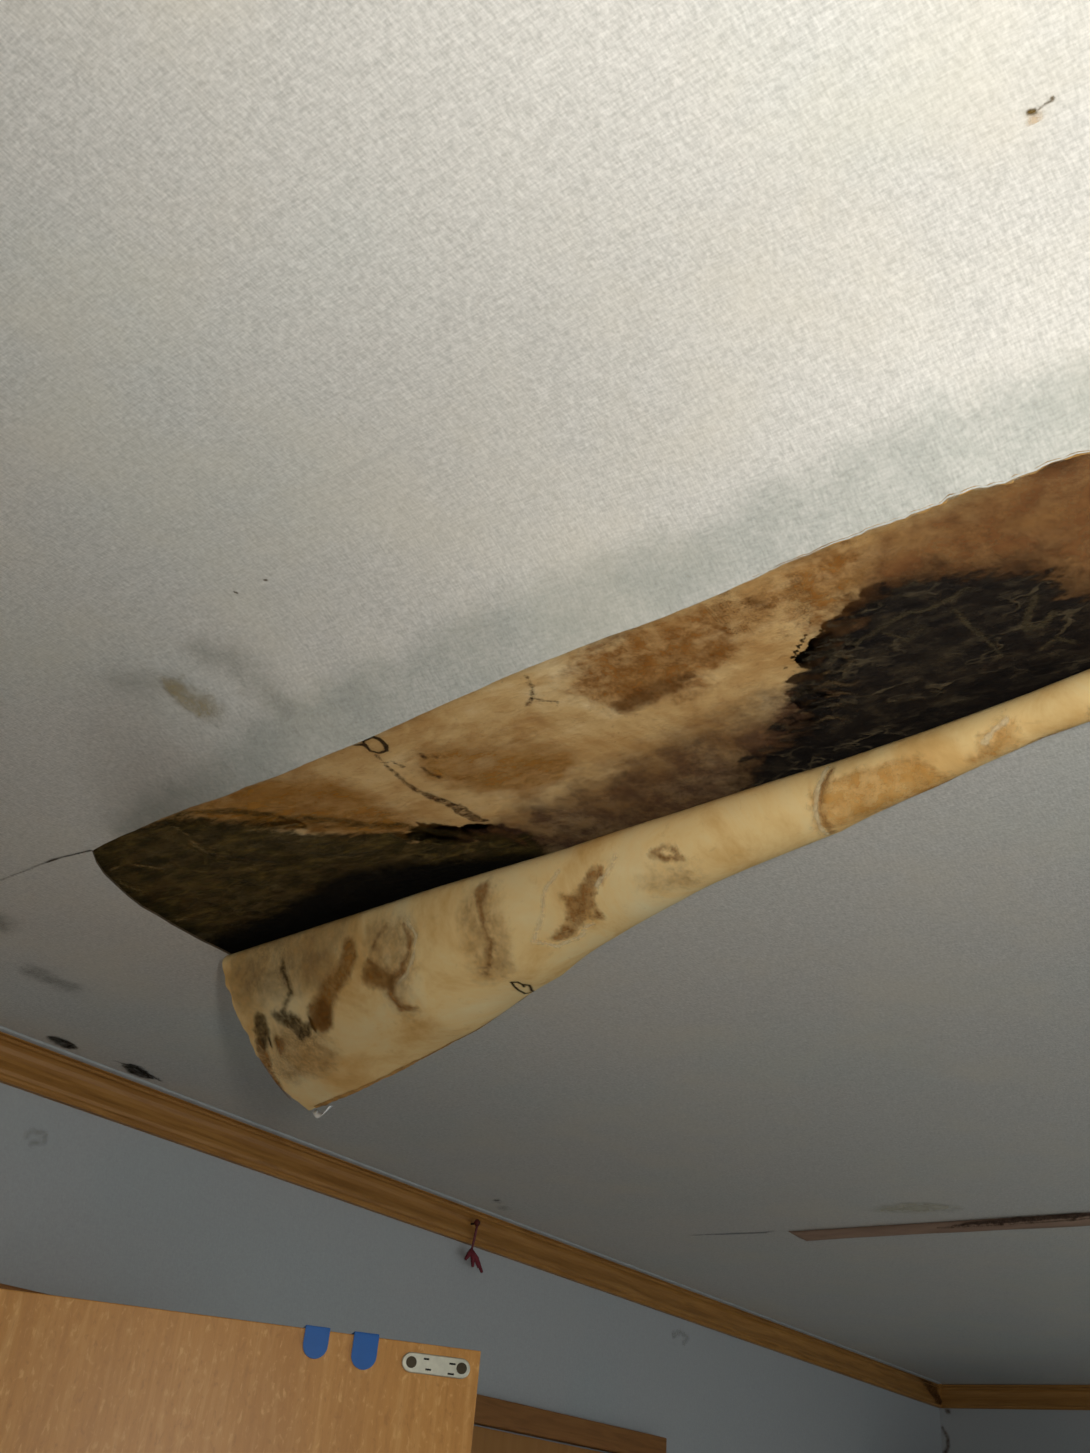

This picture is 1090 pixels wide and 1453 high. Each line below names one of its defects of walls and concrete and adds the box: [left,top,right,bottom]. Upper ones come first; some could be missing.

water stain [93,562,1090,954]
water stain [48,1036,77,1049]
water stain [122,1063,157,1079]